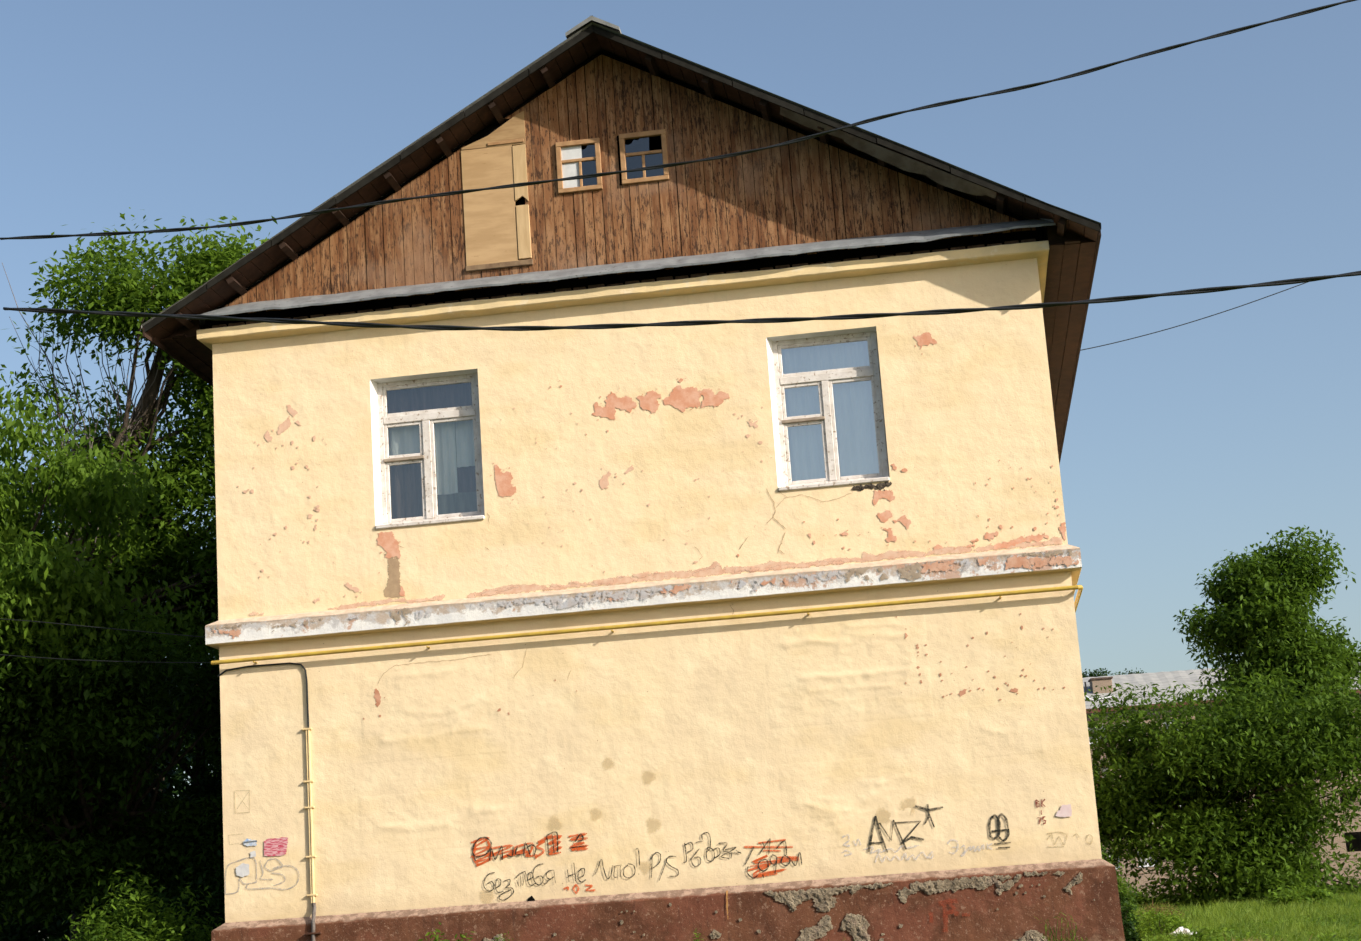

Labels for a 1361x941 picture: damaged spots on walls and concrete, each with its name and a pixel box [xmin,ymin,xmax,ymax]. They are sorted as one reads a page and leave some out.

peeling [913,331,937,355]
peeling [254,405,327,470]
peeling [592,378,763,452]
peeling [376,531,401,573]
peeling [467,461,1079,610]
crack [739,488,853,554]
peeling [313,582,445,620]
peeling [212,629,241,639]
flaking render [764,871,1083,941]